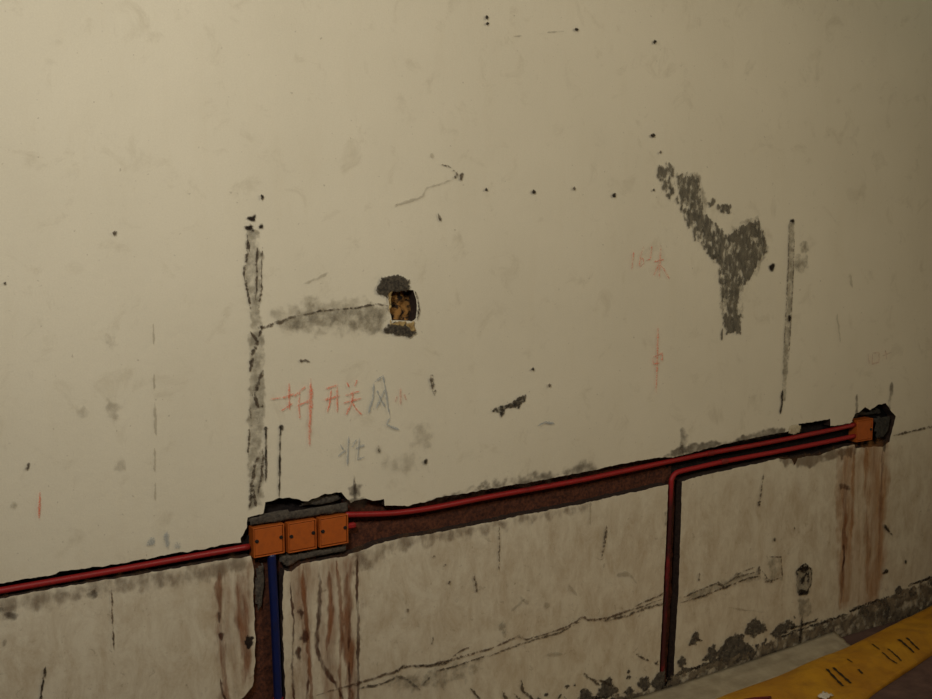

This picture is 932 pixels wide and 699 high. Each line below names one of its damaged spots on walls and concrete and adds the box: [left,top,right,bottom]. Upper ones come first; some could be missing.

spalling [376,275,420,338]
peeling [492,395,526,417]
corrosion [238,617,254,664]
corrosion [290,561,360,699]
crack [318,556,783,695]